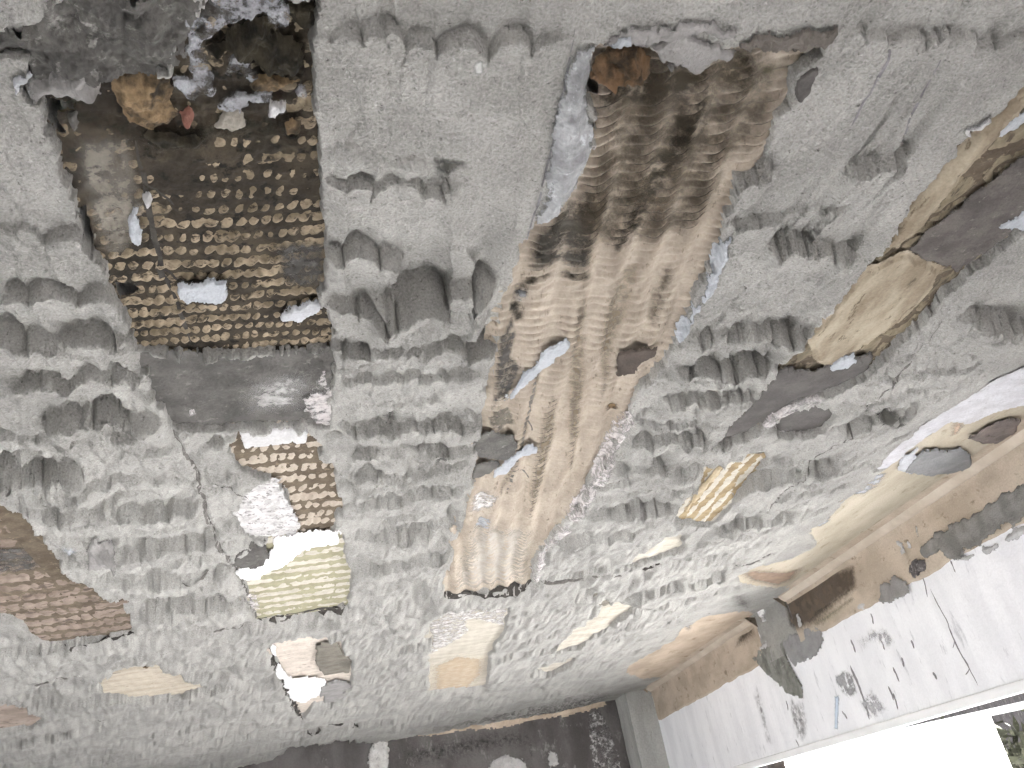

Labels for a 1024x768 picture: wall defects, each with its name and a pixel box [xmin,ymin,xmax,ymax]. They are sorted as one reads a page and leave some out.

spalling [0,0,351,619]
spalling [442,19,838,594]
spalling [723,87,1024,439]
spalling [0,505,132,642]
spalling [98,665,203,697]
crack [173,429,346,632]
spalling [267,637,352,715]
spalling [424,608,508,691]
spalling [538,593,636,672]
spalling [752,628,824,698]
peeling [836,673,856,695]
spalling [738,368,1024,589]